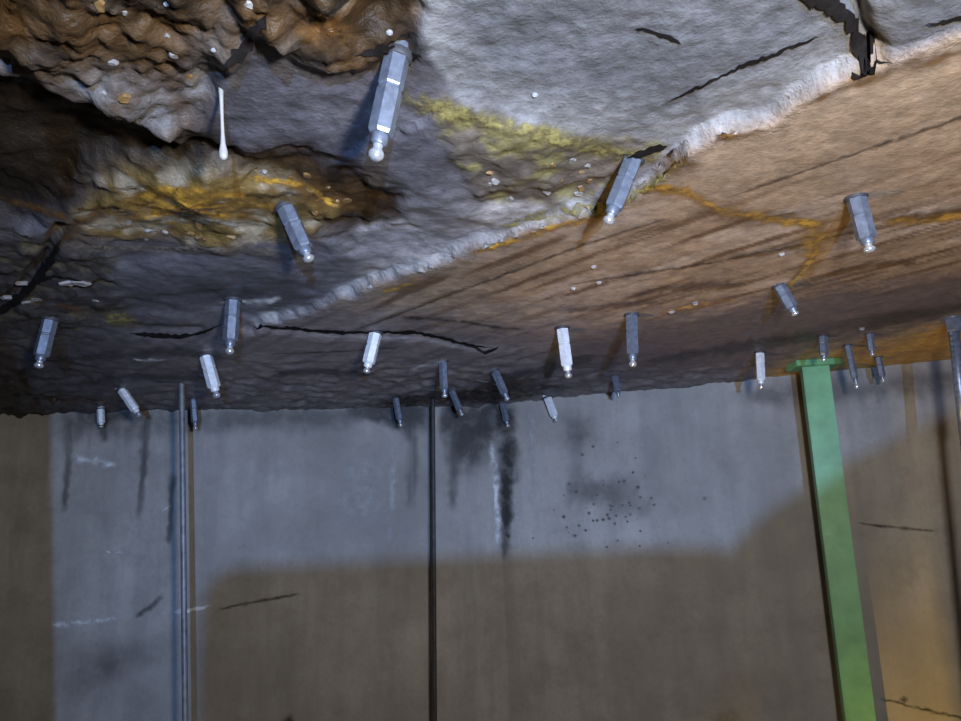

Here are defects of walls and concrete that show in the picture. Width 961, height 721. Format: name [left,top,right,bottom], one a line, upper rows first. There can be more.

crack [636,28,681,44]
crack [668,0,893,102]
crack [924,16,961,27]
spalling [0,0,961,342]
crack [0,240,81,314]
water stain [242,297,278,305]
crack [254,317,518,355]
water stain [75,455,115,467]
water stain [352,357,591,547]